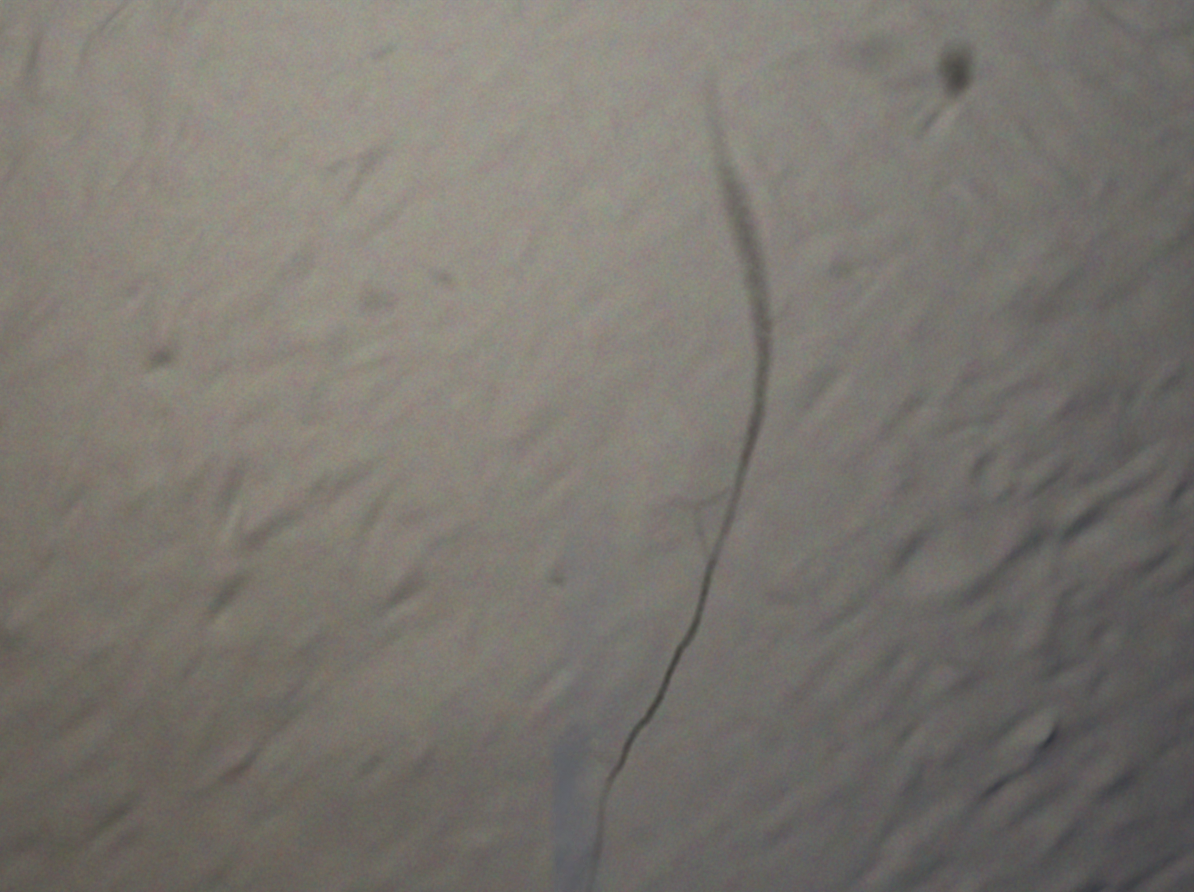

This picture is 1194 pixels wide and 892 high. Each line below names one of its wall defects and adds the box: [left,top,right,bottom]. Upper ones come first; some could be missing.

crack [732,127,786,250]